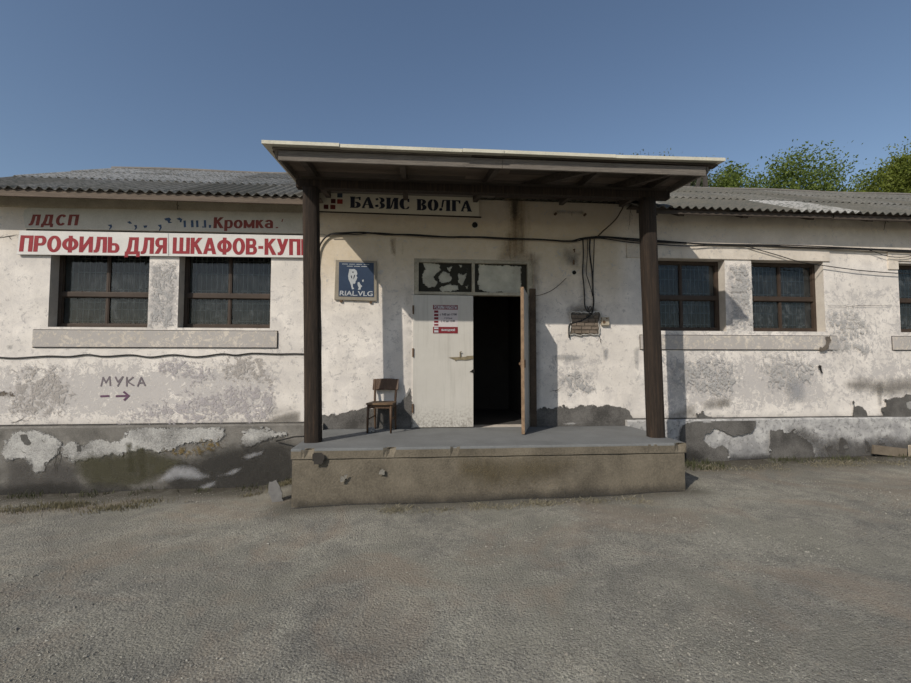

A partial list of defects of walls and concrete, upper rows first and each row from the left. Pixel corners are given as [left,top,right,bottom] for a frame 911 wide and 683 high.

peeling [0,356,287,473]
flaking render [322,388,412,429]
flaking render [537,367,636,426]
flaking render [678,411,756,462]
flaking render [768,429,815,459]
flaking render [881,394,911,417]